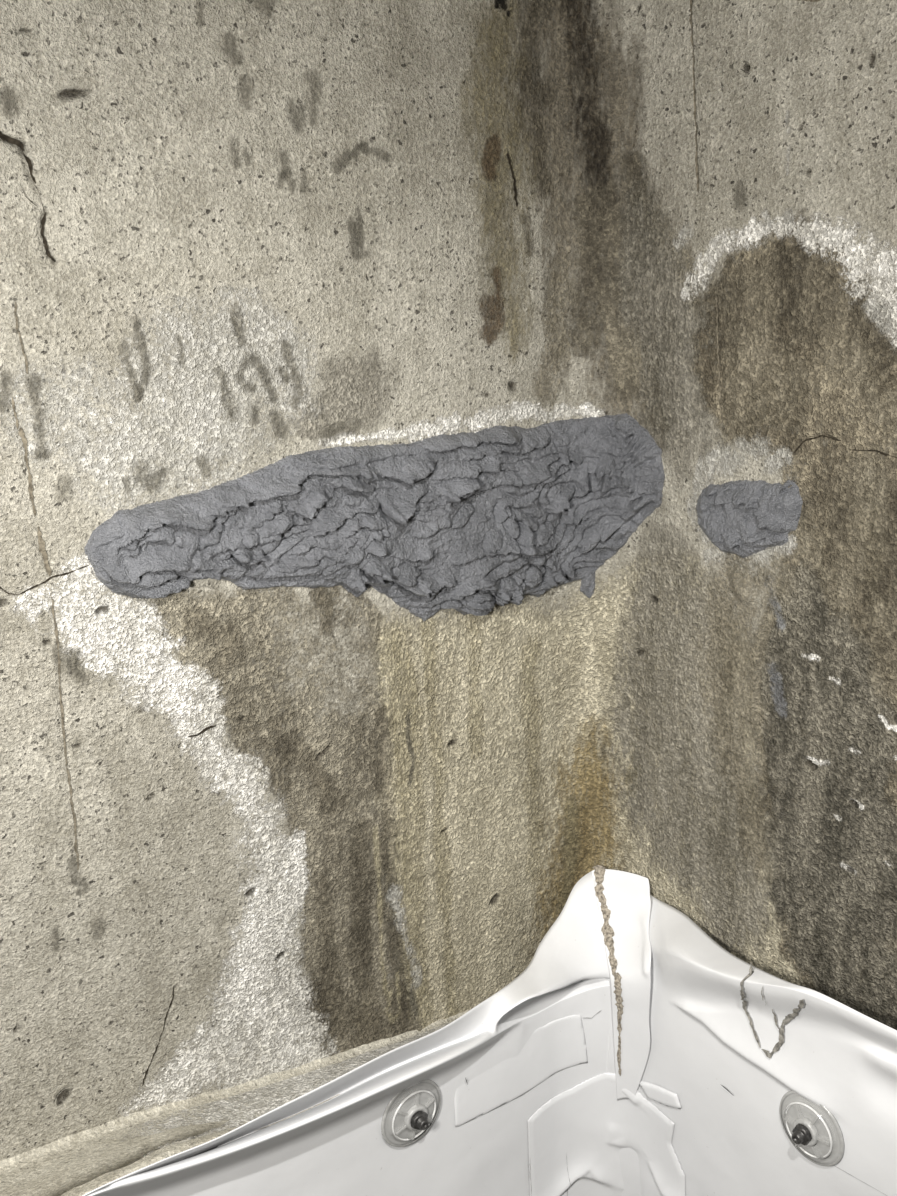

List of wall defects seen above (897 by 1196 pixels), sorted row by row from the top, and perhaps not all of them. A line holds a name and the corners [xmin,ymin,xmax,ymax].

water stain [494,0,511,17]
crack [0,86,56,264]
water stain [279,152,307,193]
water stain [360,143,388,161]
water stain [20,288,605,508]
water stain [883,757,897,816]
water stain [139,1021,453,1137]